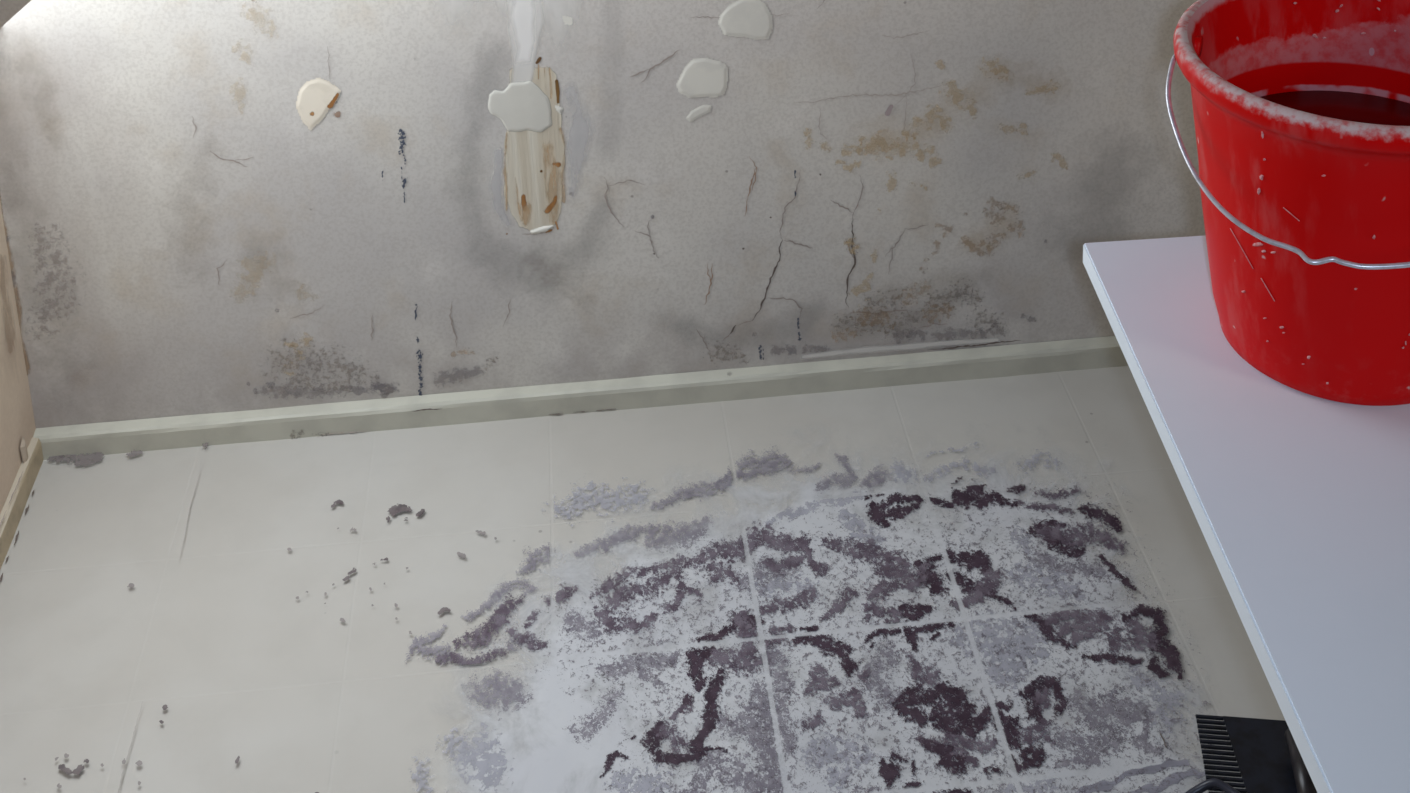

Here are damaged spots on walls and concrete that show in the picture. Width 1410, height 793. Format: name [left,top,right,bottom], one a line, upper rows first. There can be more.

flaking render [488,0,565,235]
crack [798,31,952,139]
corrosion [545,196,559,233]
crack [604,180,657,257]
crack [745,159,757,215]
crack [697,172,810,351]
crack [831,176,944,328]